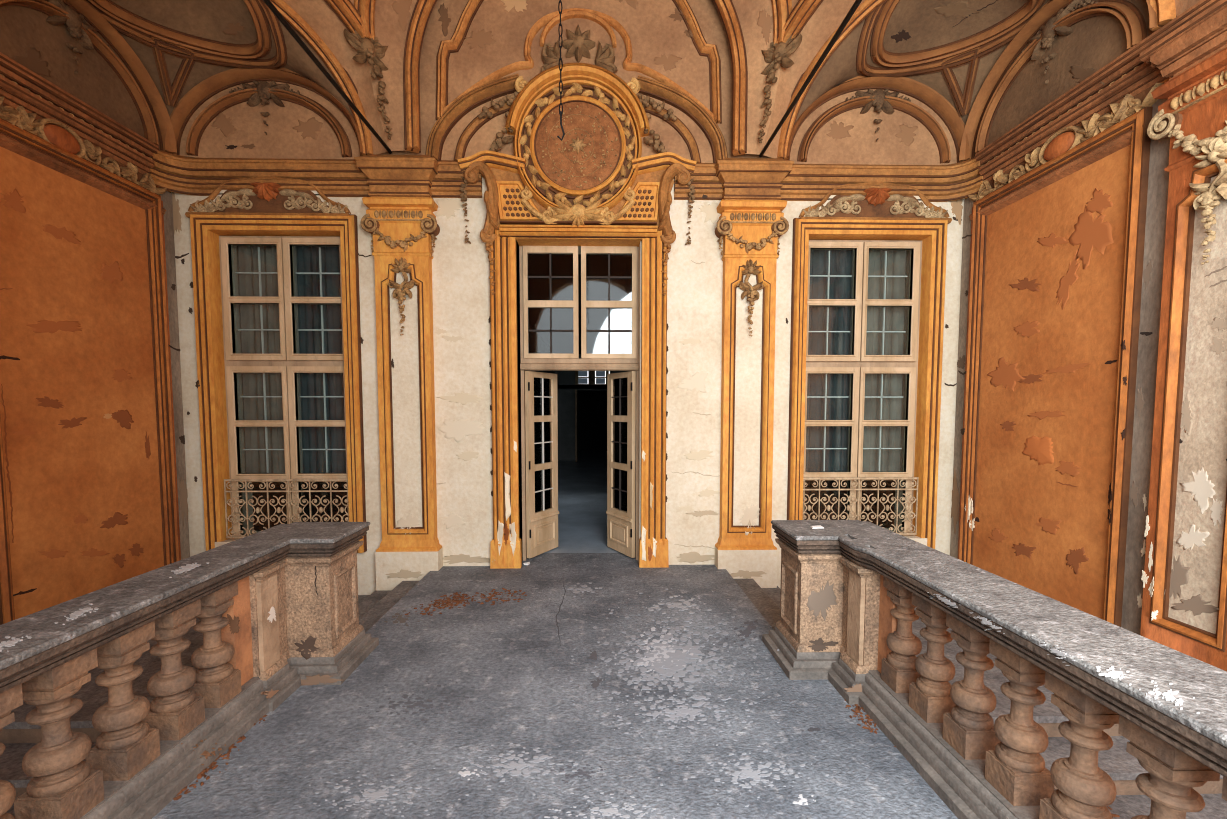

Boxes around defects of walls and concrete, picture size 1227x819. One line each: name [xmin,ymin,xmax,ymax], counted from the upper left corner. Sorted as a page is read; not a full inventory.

peeling [490,470,516,556]
peeling [641,526,657,561]
spalling [1176,467,1223,550]